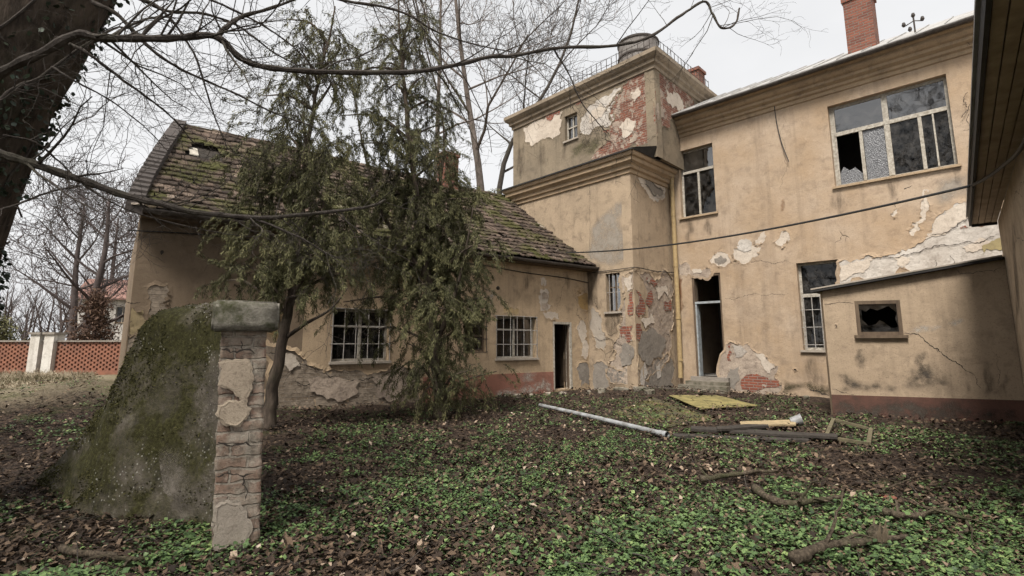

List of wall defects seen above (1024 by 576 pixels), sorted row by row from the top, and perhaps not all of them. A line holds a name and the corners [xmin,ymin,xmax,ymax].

flaking render [523,69,695,161]
peeling [636,176,667,204]
spalling [835,186,1003,284]
spalling [575,228,793,390]
flaking render [219,360,251,425]
spalling [716,340,799,395]
crack [904,333,1000,389]